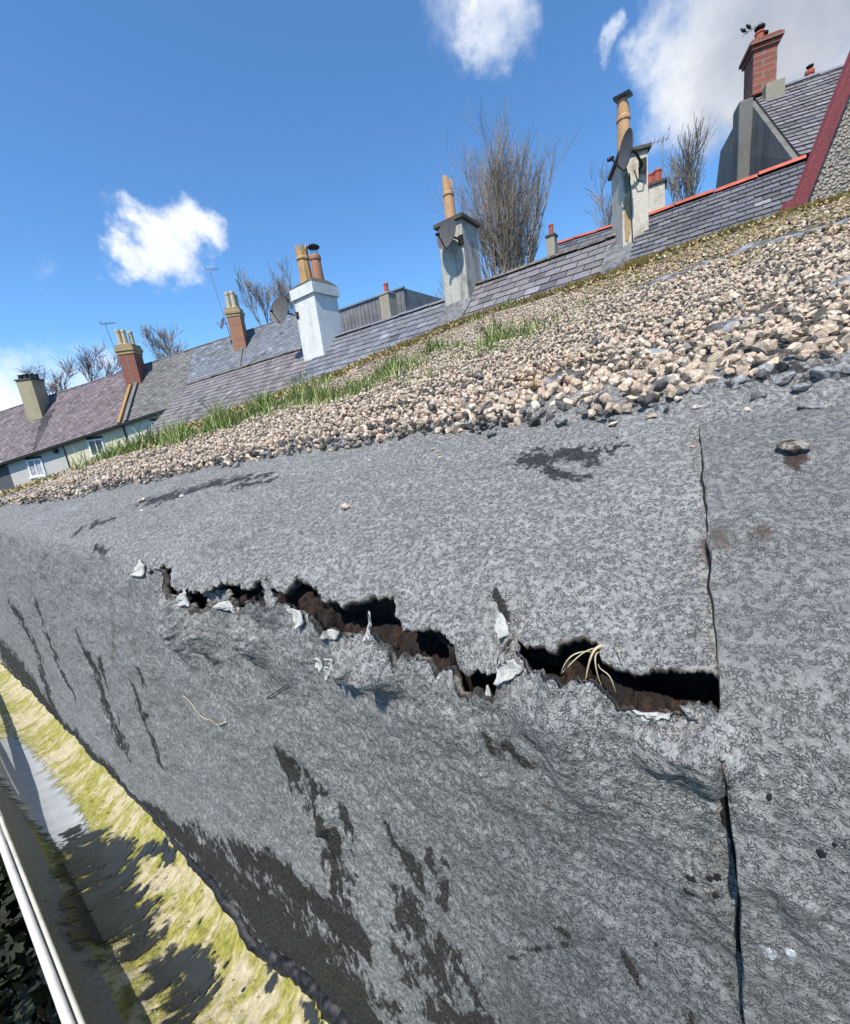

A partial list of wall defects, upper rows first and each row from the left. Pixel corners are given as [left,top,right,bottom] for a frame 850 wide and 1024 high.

water stain [0,597,120,779]
water stain [74,627,132,763]
water stain [128,666,163,768]
crack [492,587,510,631]
crack [481,732,535,769]
crack [700,444,719,680]
water stain [46,746,501,1024]
crack [720,796,742,955]